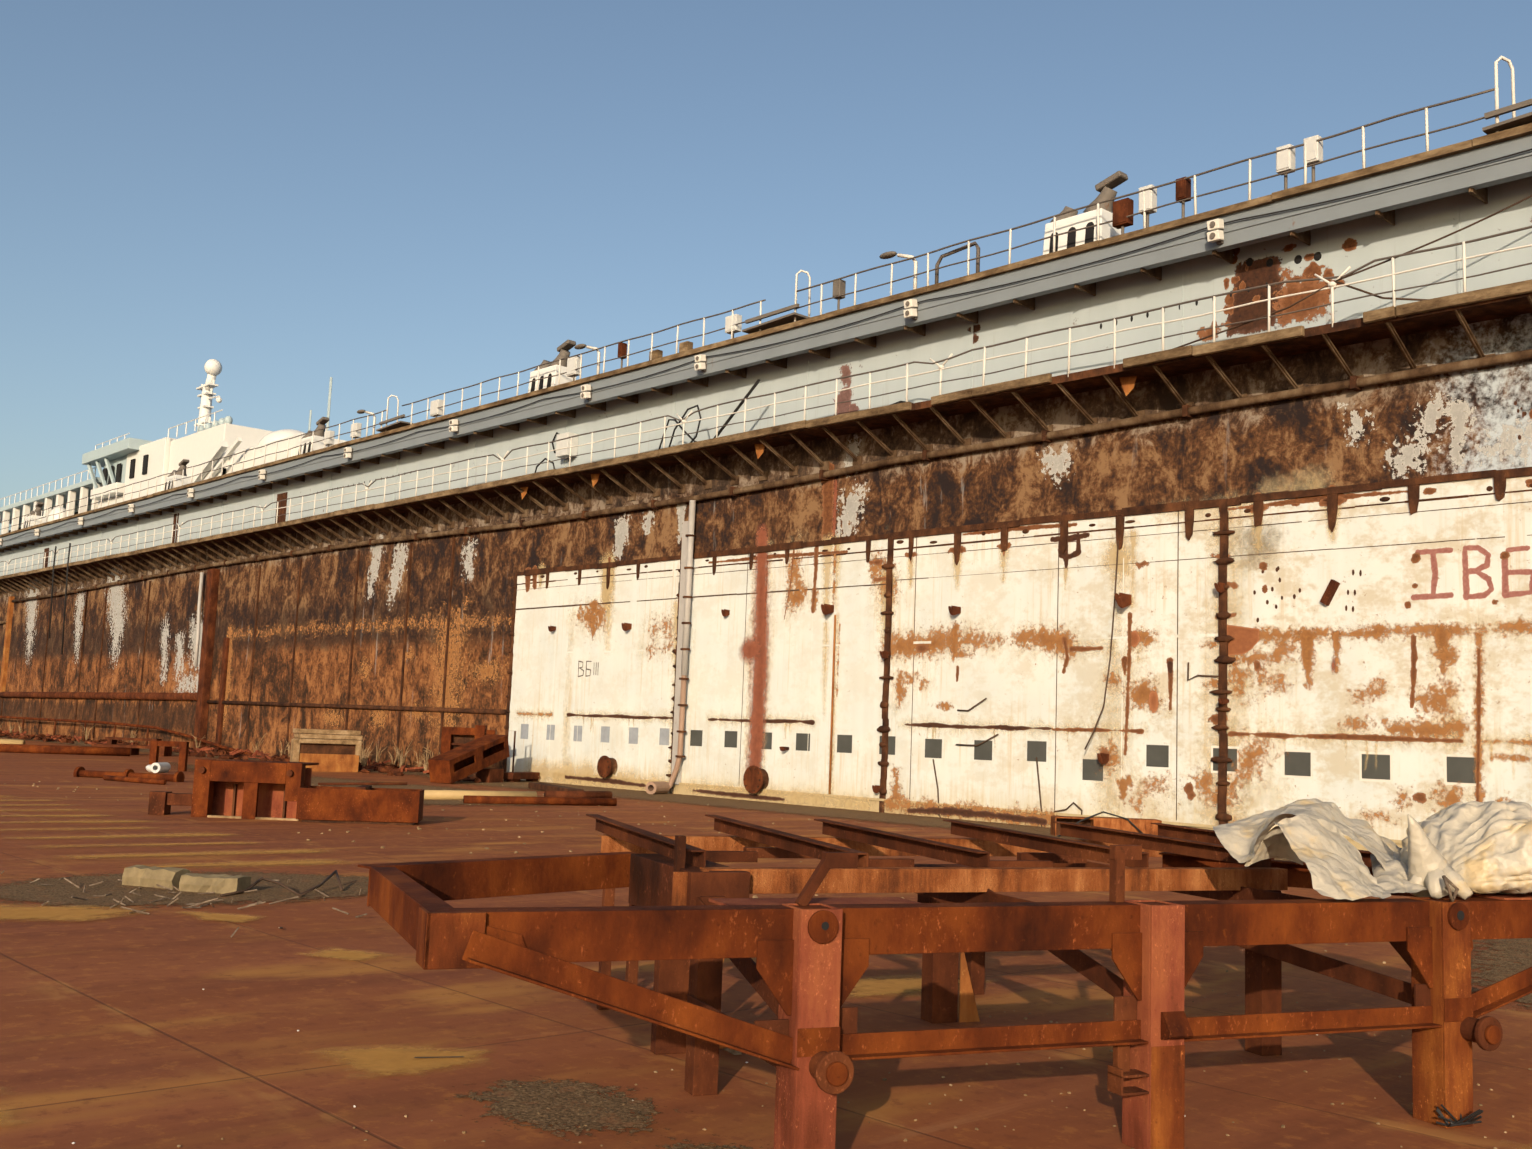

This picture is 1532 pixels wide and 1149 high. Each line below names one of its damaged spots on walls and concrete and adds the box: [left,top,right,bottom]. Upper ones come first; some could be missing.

corrosion [833,364,859,415]
corrosion [223,596,512,753]
corrosion [577,556,614,638]
corrosion [646,604,678,659]
corrosion [708,462,848,768]
corrosion [868,485,1532,827]
corrosion [517,712,673,721]
corrosion [530,761,672,791]
corrosion [691,767,1057,827]